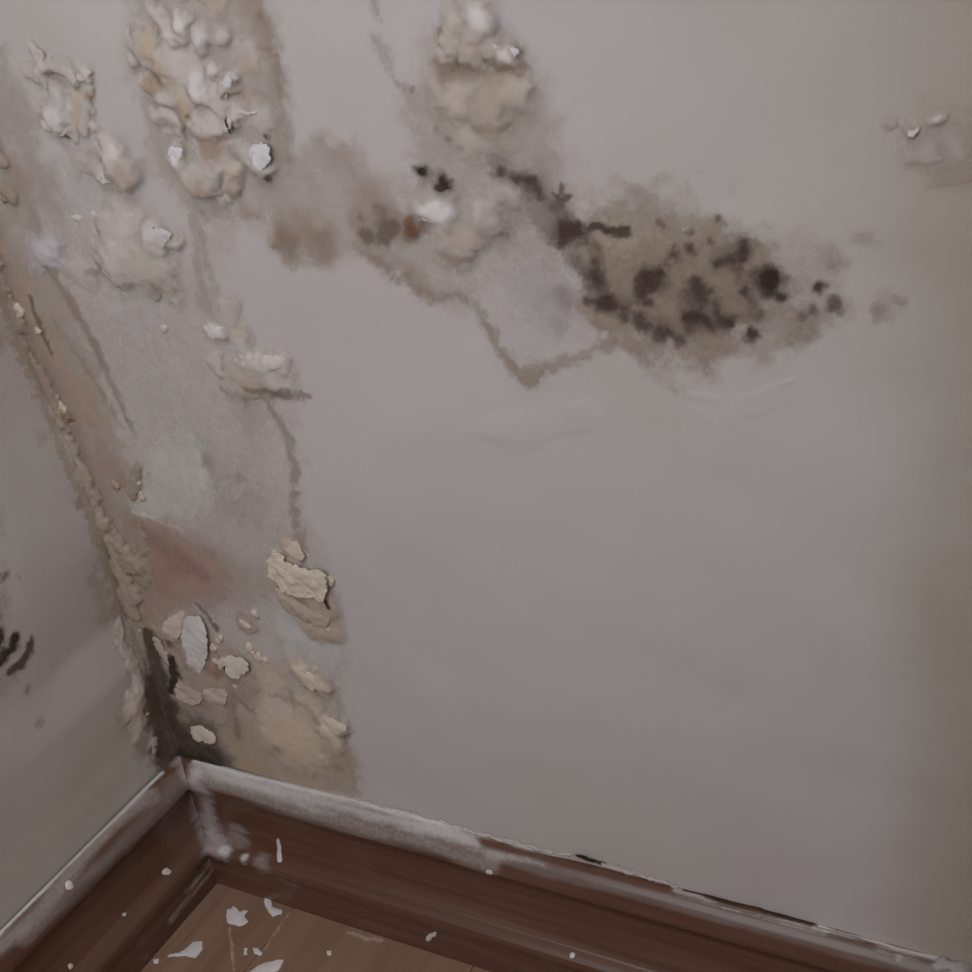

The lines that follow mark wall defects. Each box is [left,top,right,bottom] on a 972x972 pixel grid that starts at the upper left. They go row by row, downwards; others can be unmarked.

peeling [20,41,98,144]
peeling [122,0,274,206]
peeling [410,180,521,267]
water stain [136,0,847,388]
peeling [0,261,344,765]
water stain [0,67,356,797]